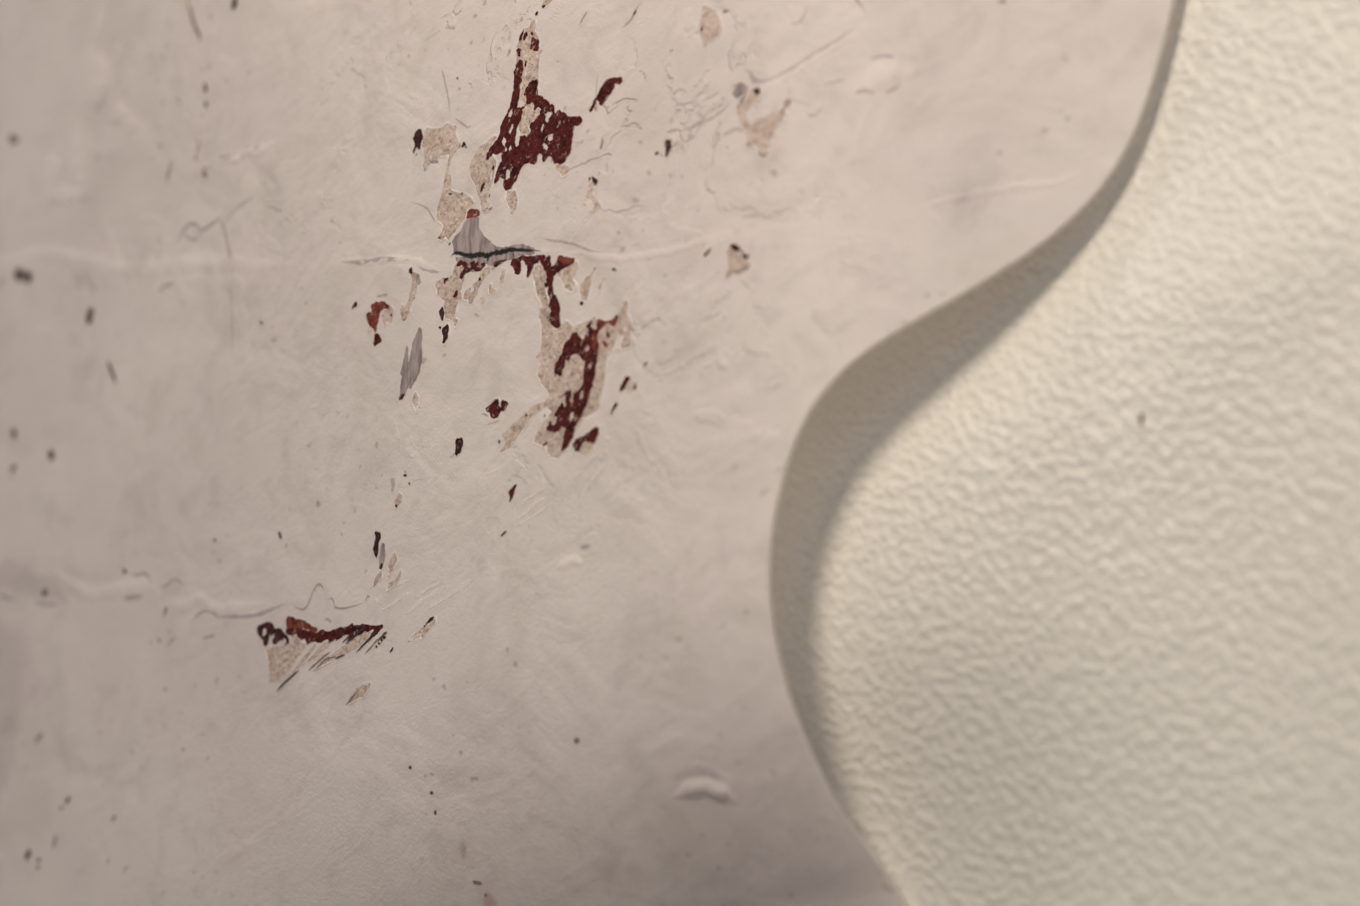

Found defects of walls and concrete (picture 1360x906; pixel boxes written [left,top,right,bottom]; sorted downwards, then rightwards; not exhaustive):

spalling [413,0,623,243]
spalling [732,82,794,158]
crack [448,242,539,264]
spalling [352,255,647,461]
spalling [256,616,437,692]